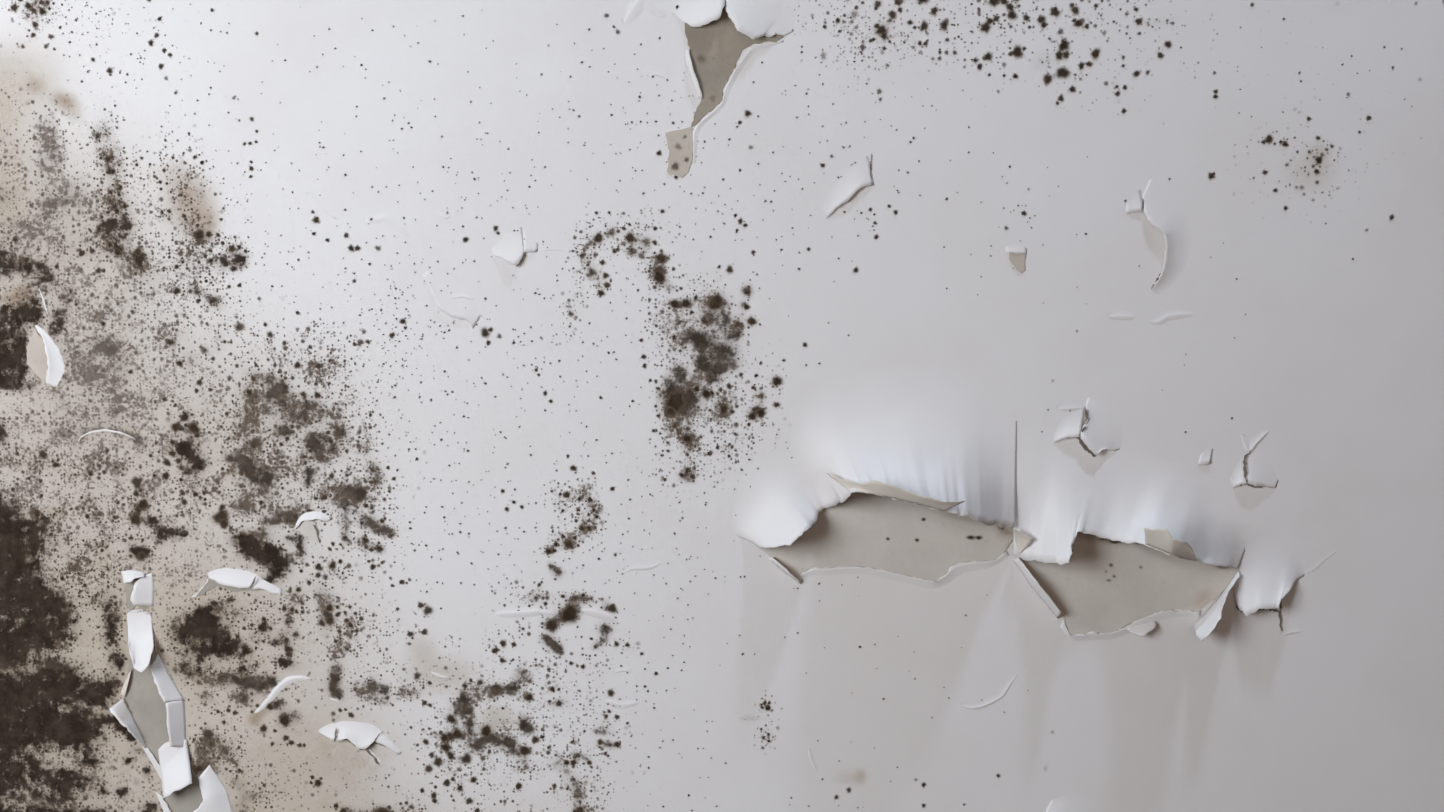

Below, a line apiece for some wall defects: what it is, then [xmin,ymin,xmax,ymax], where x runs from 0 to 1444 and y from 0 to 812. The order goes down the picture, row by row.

peeling [622,0,795,177]
mould [792,0,1183,105]
mould [1104,56,1149,115]
peeling [822,154,874,218]
peeling [491,227,563,266]
peeling [1125,179,1192,294]
peeling [423,271,480,328]
peeling [26,323,68,390]
peeling [731,362,1305,642]
peeling [190,565,282,598]
peeling [110,570,233,812]
peeling [317,719,402,765]